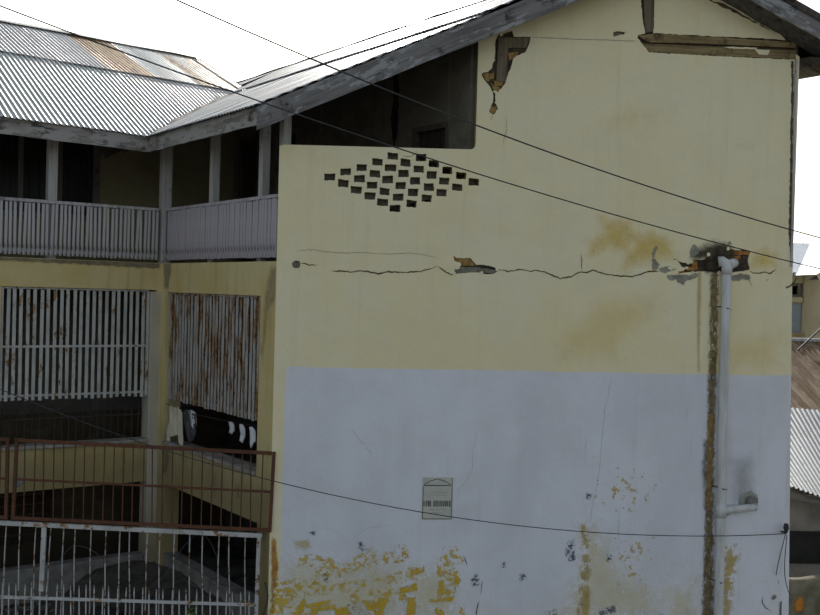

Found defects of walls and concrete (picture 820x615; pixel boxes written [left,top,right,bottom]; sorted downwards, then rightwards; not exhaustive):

flaking render [481,32,530,114]
crack [299,249,453,275]
crack [501,256,658,279]
flaking render [652,245,721,285]
flaking render [727,241,750,281]
damp [693,244,749,615]
peeling [271,541,418,615]
peeling [437,548,464,595]
damp [565,526,615,615]